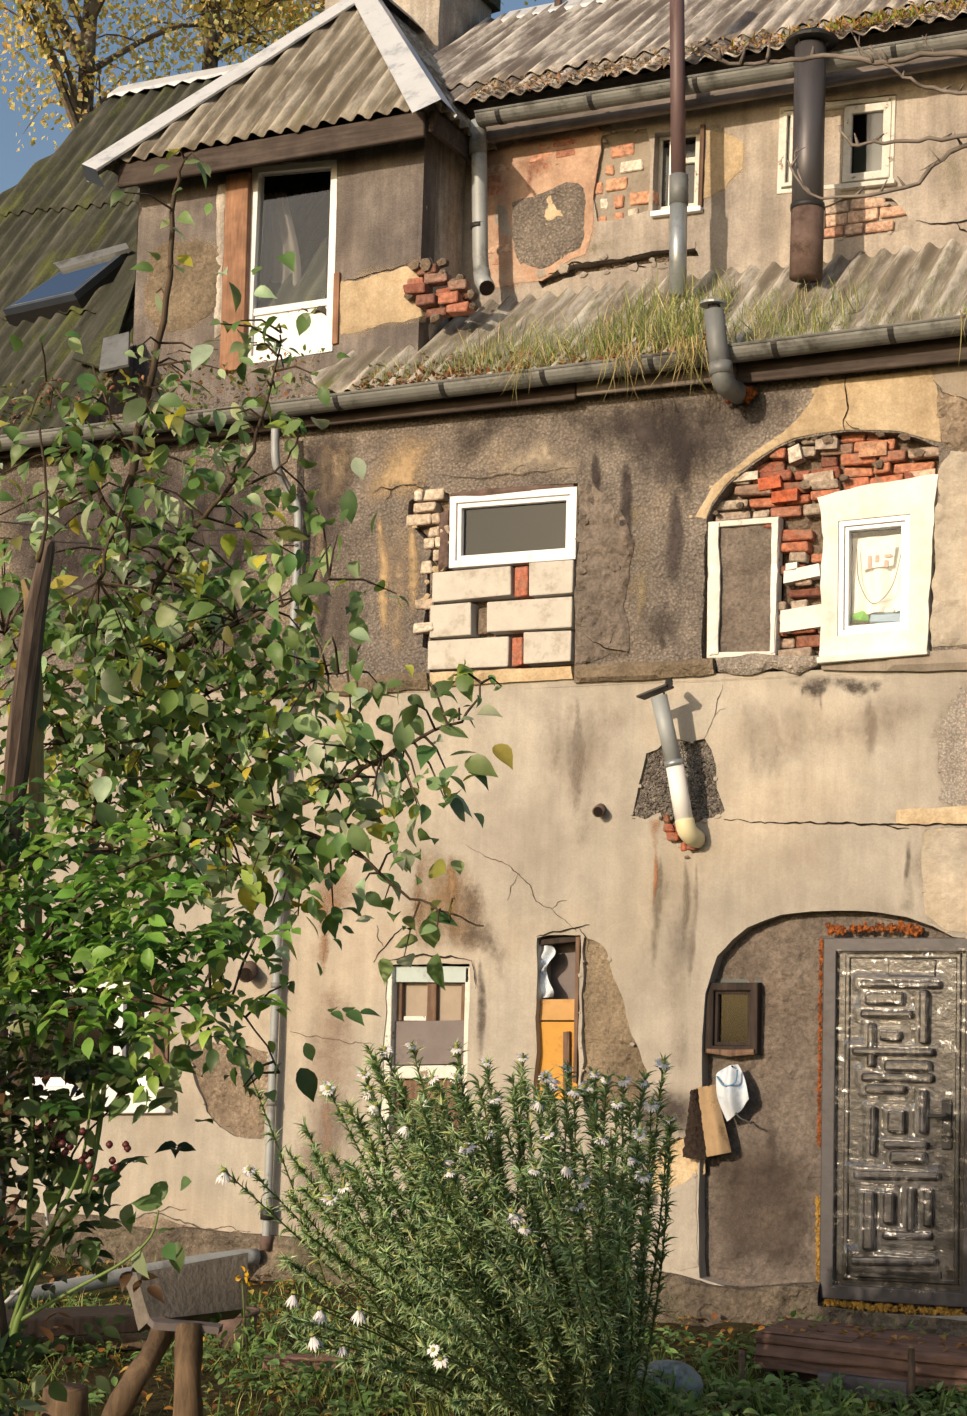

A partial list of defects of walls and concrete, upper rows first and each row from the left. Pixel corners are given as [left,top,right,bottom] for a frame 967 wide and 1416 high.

flaking render [340,258,479,335]
flaking render [487,125,669,291]
flaking render [687,239,698,256]
flaking render [824,197,913,241]
flaking render [689,368,967,668]
flaking render [630,739,725,859]
crack [724,819,967,829]
crack [466,845,589,949]
flaking render [578,938,647,1113]
flaking render [189,1040,269,1141]